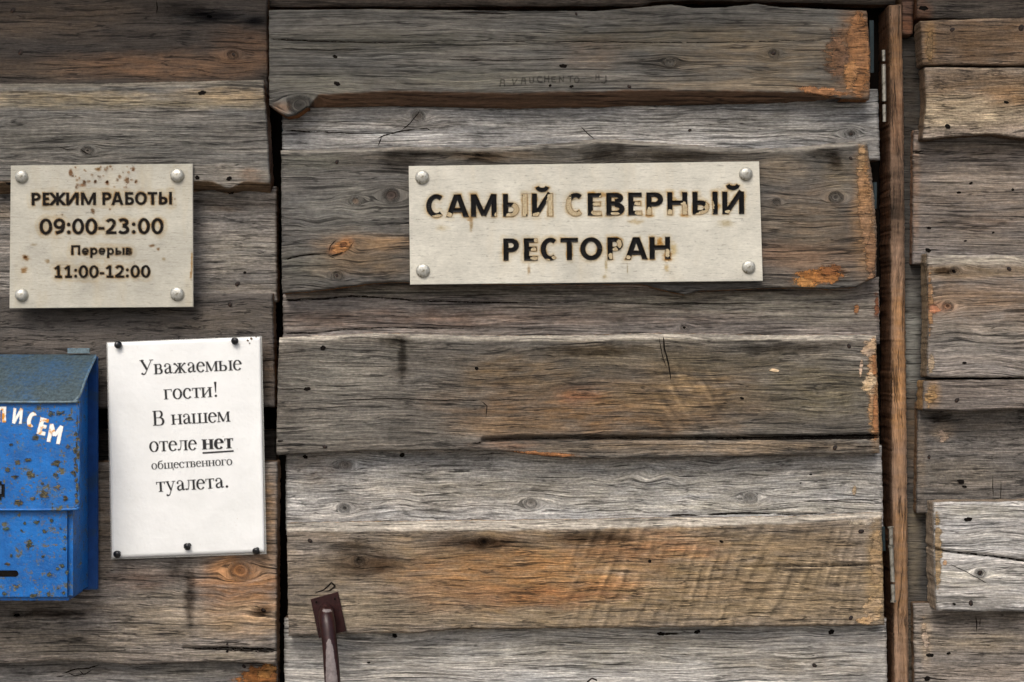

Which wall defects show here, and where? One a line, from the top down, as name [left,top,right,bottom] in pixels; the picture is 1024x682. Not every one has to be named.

peeling [799,11,870,99]
crack [291,110,431,145]
peeling [794,264,844,288]
peeling [859,337,879,441]
crack [474,433,879,448]